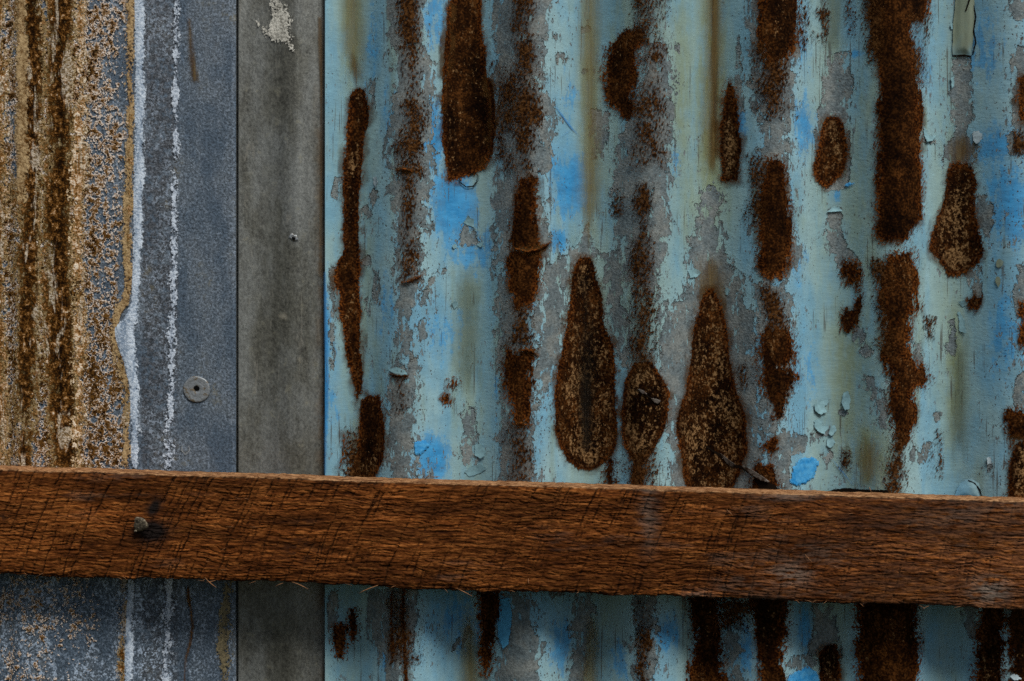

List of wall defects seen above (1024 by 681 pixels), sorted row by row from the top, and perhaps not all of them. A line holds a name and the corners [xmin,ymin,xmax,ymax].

corrosion [0,0,147,469]
corrosion [331,87,409,477]
peeling [359,0,447,479]
corrosion [388,0,547,482]
peeling [452,0,892,490]
corrosion [551,0,1003,493]
corrosion [329,606,361,661]
corrosion [383,589,424,681]
corrosion [471,590,504,680]
corrosion [680,596,796,681]
corrosion [816,603,927,681]
corrosion [968,608,1024,681]